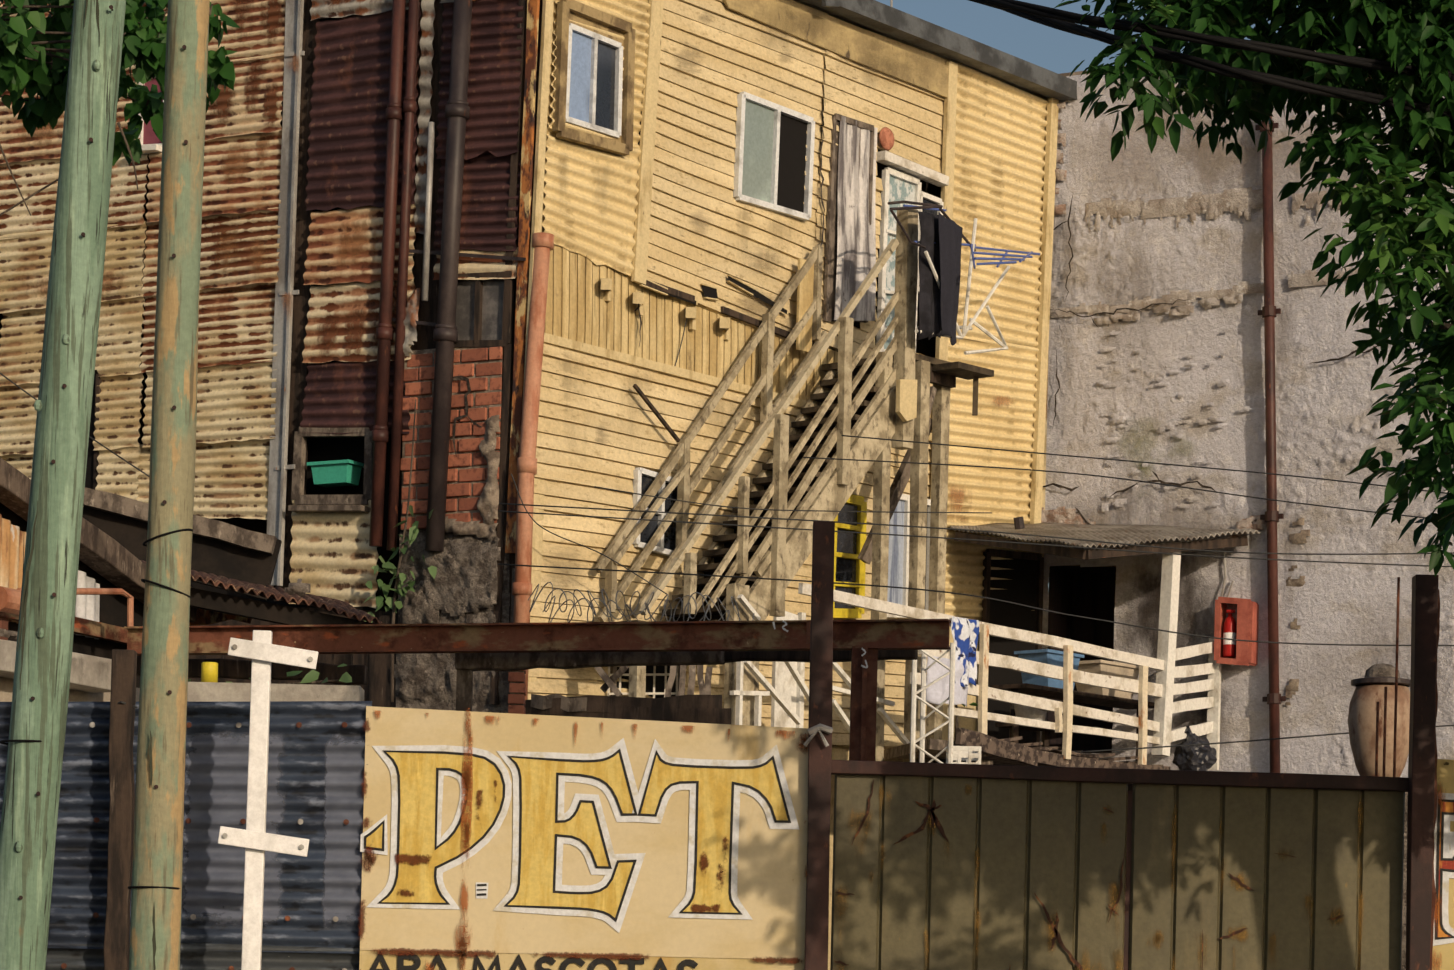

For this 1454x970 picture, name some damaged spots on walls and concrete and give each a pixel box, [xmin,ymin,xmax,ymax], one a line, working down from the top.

corrosion [22,116,63,139]
corrosion [210,0,285,183]
corrosion [318,282,397,354]
corrosion [1034,893,1089,970]